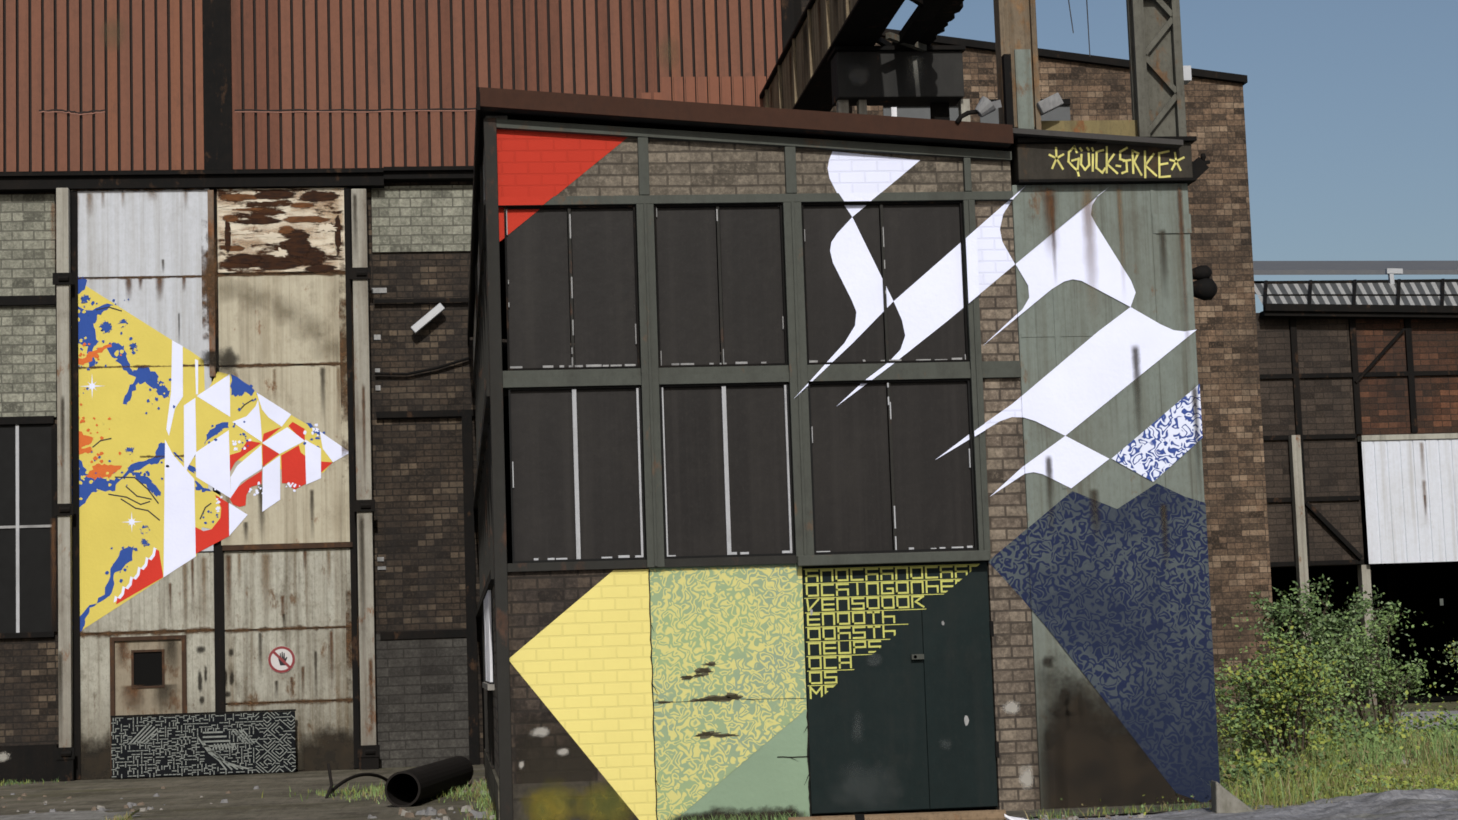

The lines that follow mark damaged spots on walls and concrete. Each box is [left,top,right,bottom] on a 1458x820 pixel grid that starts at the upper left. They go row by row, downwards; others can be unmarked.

peeling [218,188,343,273]
corrosion [1045,189,1054,239]
spalling [680,661,716,680]
spalling [656,692,743,704]
spalling [694,731,739,739]
water stain [1021,686,1211,809]